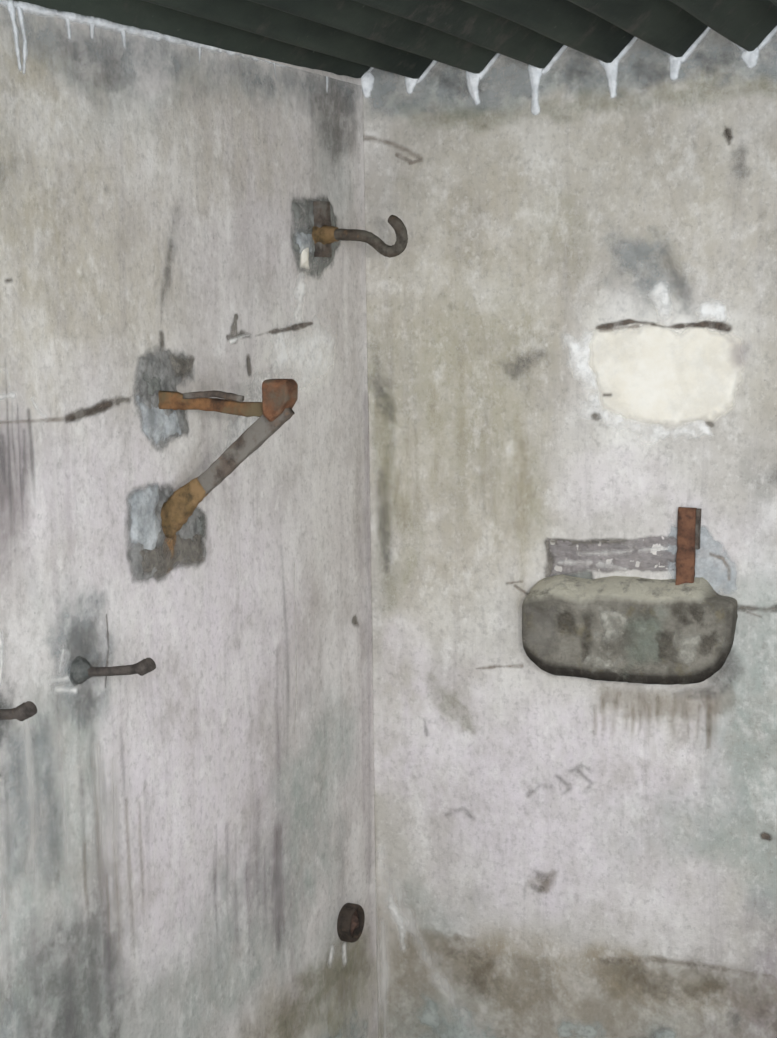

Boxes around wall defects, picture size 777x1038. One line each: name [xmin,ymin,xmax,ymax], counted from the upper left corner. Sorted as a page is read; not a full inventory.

leakage [368,69,396,108]
leakage [403,65,542,107]
crack [597,319,731,331]
peeling [160,332,194,376]
peeling [565,283,742,443]
peeling [129,486,204,578]